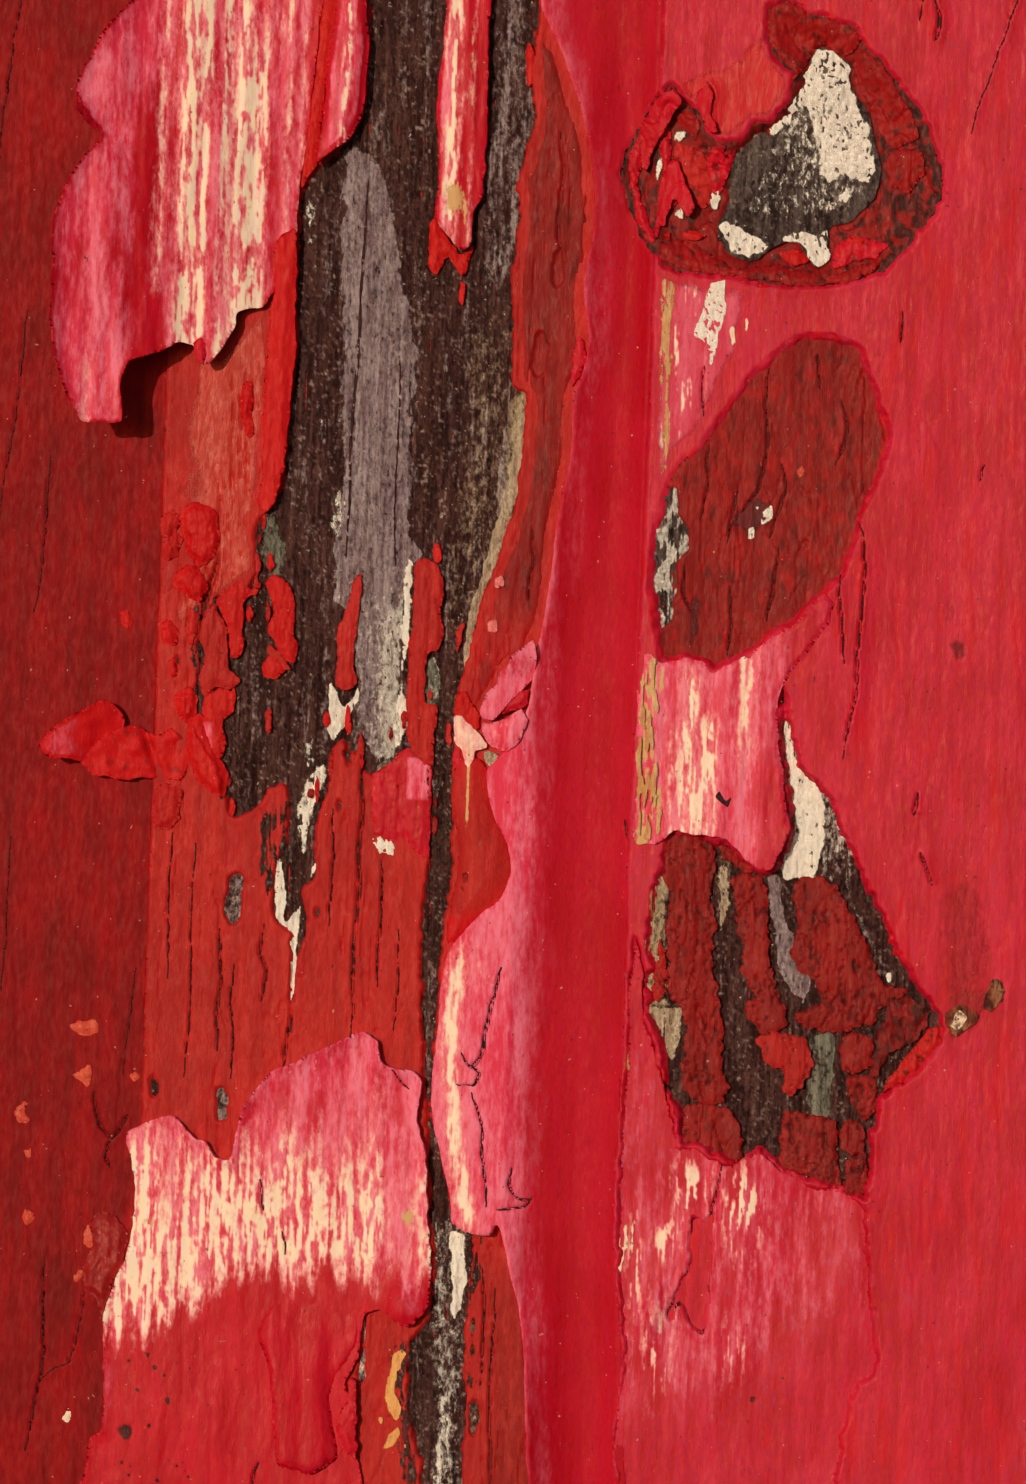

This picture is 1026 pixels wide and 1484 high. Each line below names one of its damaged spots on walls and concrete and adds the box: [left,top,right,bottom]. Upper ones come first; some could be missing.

spalling [620,1,944,365]
crack [919,0,942,41]
crack [971,0,1018,133]
spalling [733,499,769,536]
peeling [39,0,540,1484]
crack [838,521,866,759]
peeling [14,1101,30,1124]
peeling [22,1209,34,1225]
crack [456,967,532,1211]
peeling [614,593,943,1484]